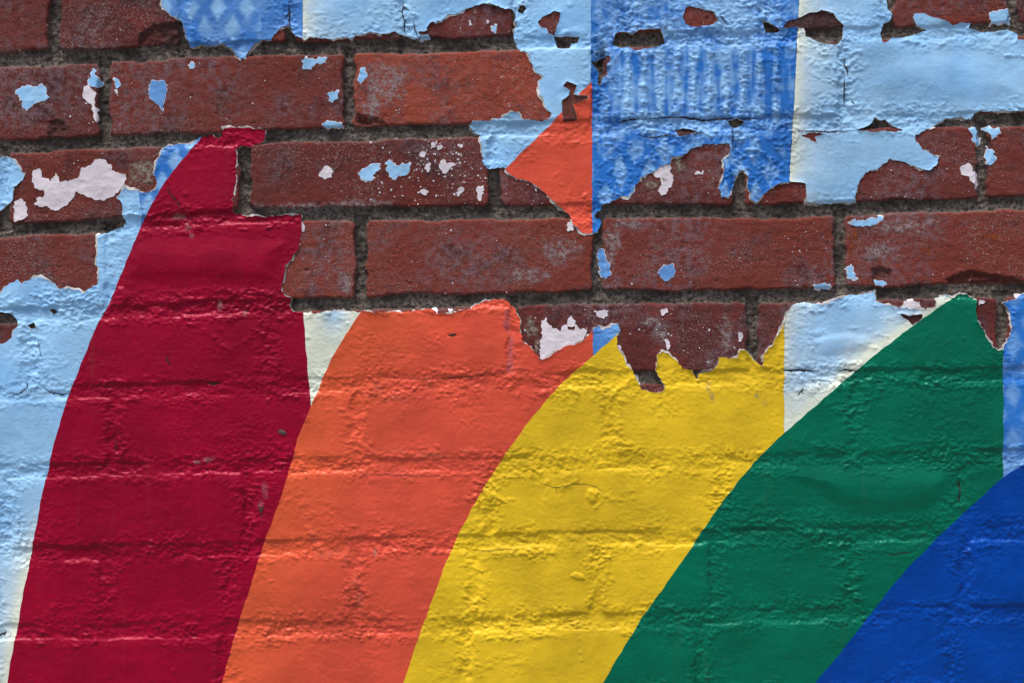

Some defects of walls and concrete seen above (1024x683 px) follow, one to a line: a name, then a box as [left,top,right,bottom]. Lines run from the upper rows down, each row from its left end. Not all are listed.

peeling [0,0,1024,393]